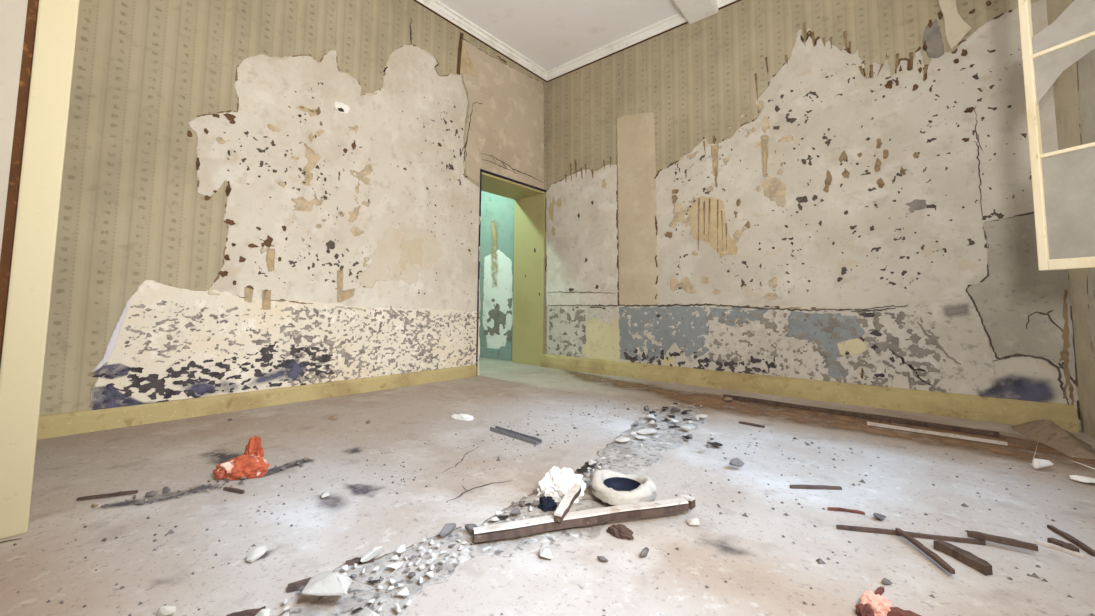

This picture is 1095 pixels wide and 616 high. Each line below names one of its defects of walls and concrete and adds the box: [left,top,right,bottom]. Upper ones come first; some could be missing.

flaking render [912,11,982,92]
spalling [212,113,236,124]
peeling [90,227,526,410]
spalling [296,106,323,126]
spalling [690,167,750,287]
crack [549,132,961,385]
peeling [538,276,998,397]
spalling [757,100,797,134]
spalling [796,139,889,210]
damp [980,378,1052,402]
crack [966,107,1078,405]
peeling [1073,0,1095,358]